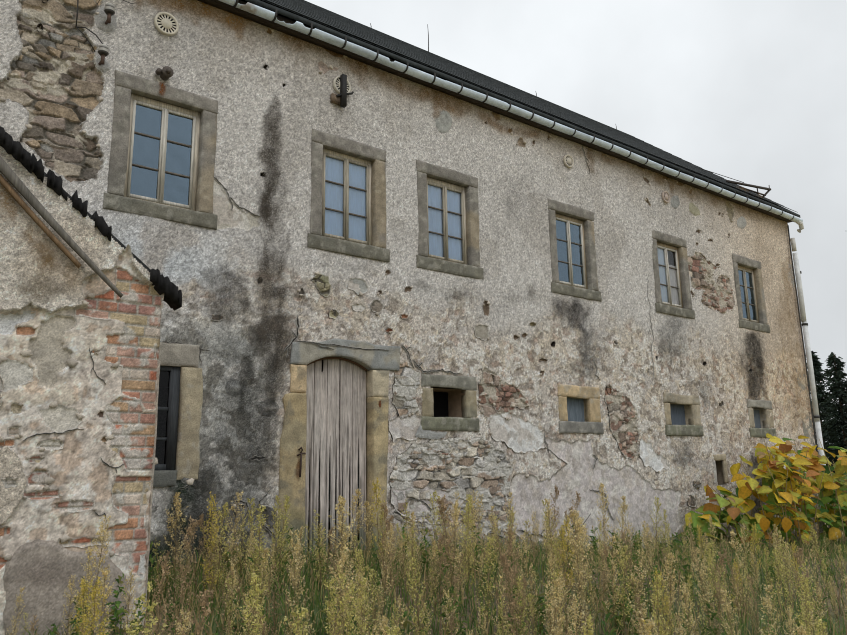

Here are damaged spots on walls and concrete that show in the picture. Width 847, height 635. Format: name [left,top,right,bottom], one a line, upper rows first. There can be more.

spalling [0,0,106,183]
crack [214,177,261,217]
water stain [255,102,291,383]
spalling [688,229,735,315]
crack [23,428,81,441]
peeling [0,244,163,635]
peeling [389,361,702,551]
water stain [742,332,765,400]